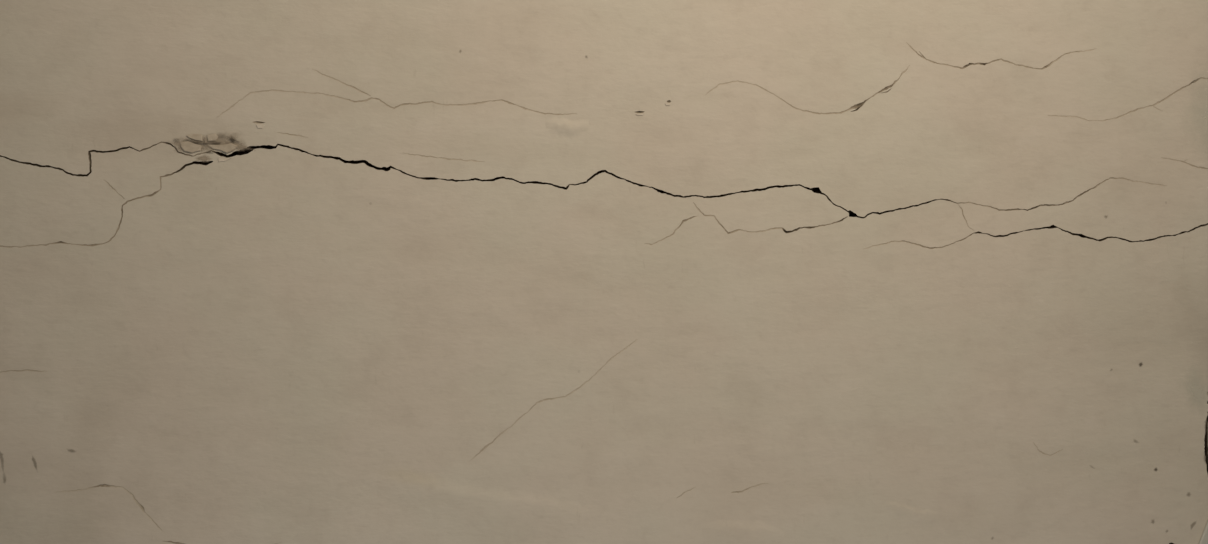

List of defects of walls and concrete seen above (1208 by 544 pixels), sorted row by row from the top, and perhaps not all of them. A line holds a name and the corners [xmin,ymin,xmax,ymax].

crack [707,42,1094,114]
crack [1048,77,1208,121]
crack [0,132,1208,249]
crack [469,340,636,462]